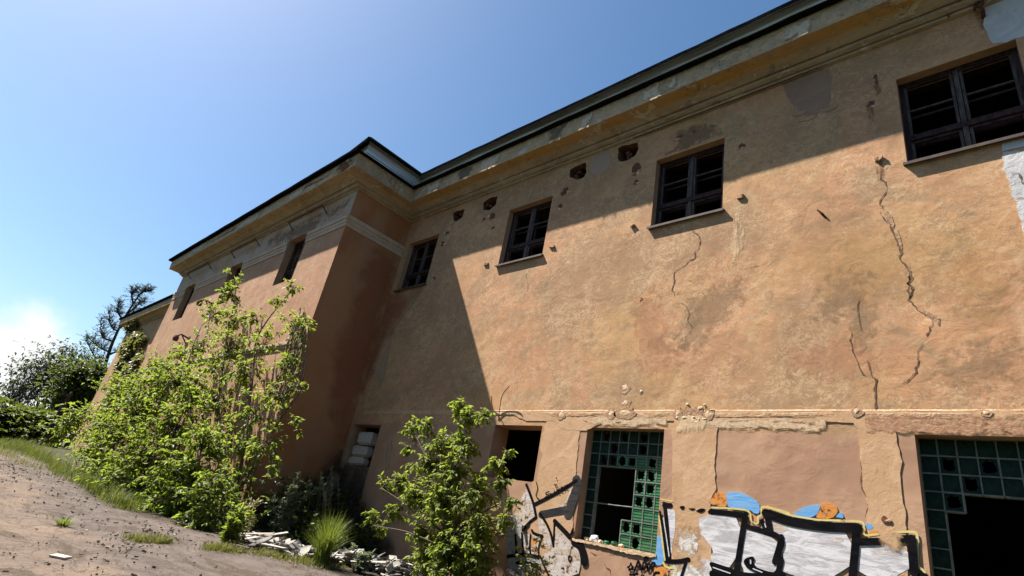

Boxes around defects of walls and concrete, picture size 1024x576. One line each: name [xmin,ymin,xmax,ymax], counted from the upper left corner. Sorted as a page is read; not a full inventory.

peeling [983,0,1024,44]
spalling [439,192,501,247]
spalling [556,158,591,210]
spalling [613,136,643,185]
peeling [1002,138,1024,232]
crack [671,230,701,333]
crack [849,171,941,419]
peeling [511,403,1024,576]